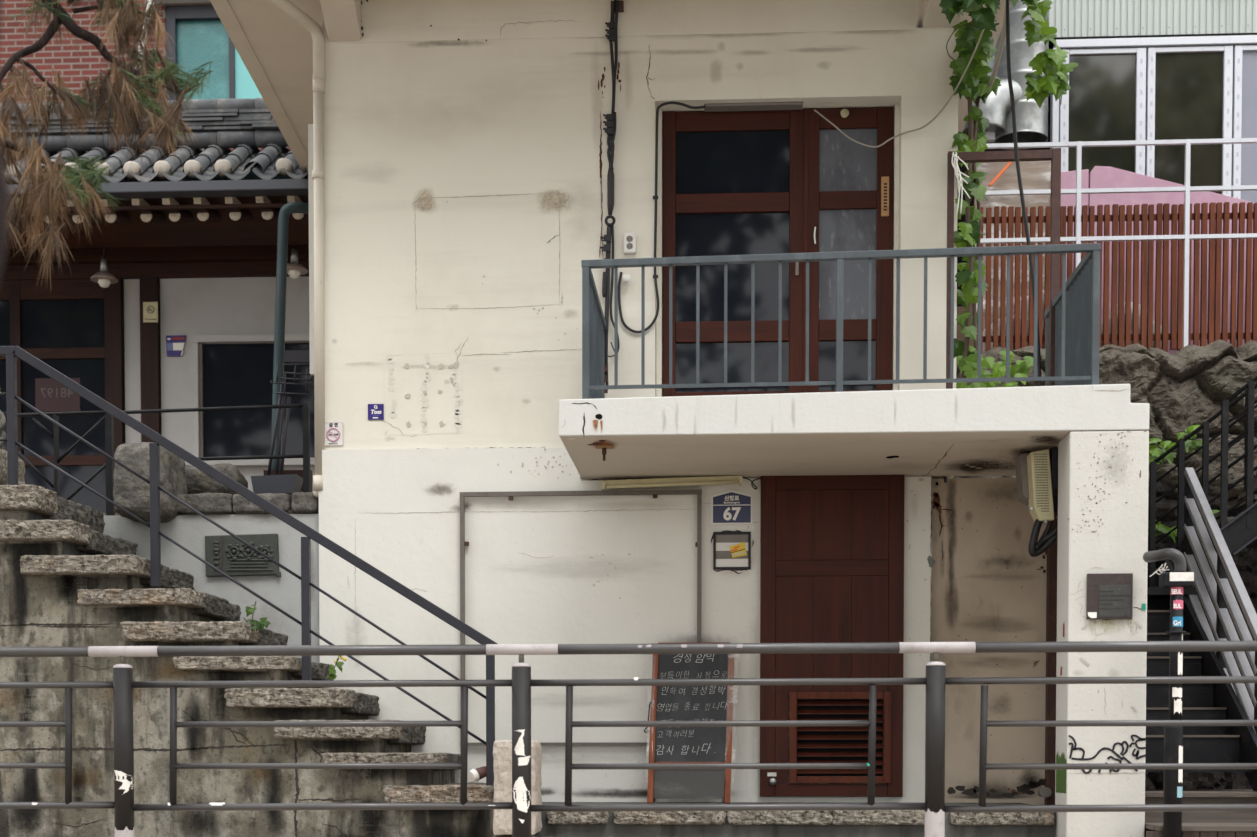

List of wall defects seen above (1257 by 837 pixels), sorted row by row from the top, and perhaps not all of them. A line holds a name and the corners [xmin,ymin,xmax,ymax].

water stain [1067,430,1147,533]
water stain [2,543,52,630]
water stain [9,664,34,730]
water stain [11,757,40,827]
water stain [72,768,92,802]